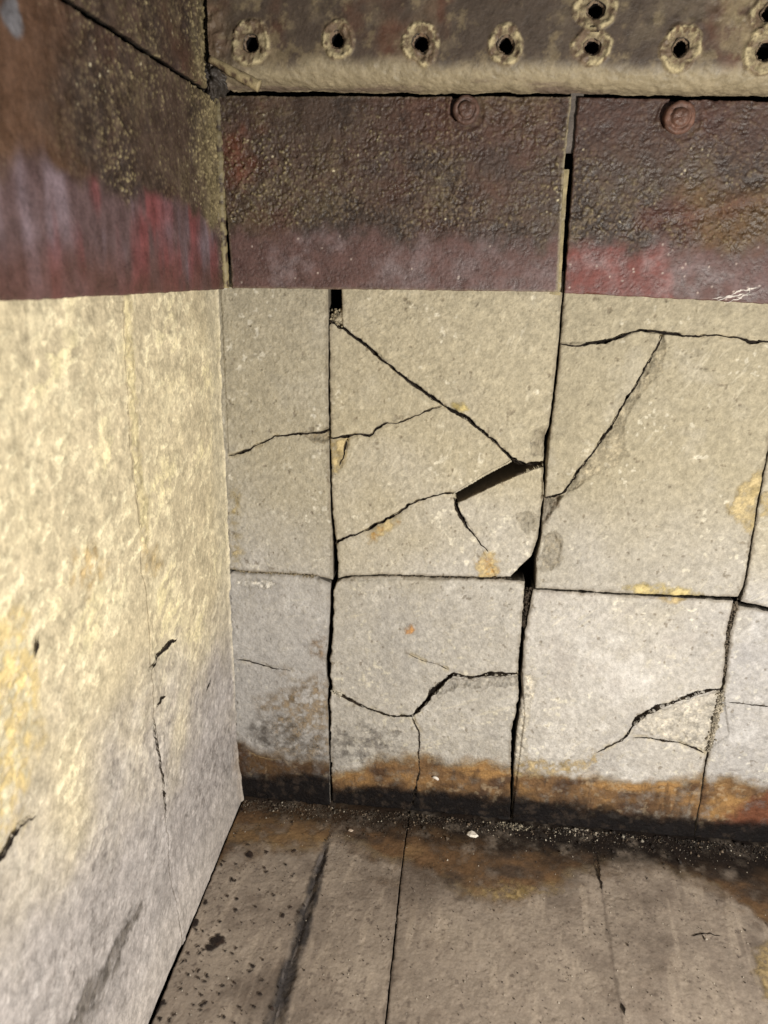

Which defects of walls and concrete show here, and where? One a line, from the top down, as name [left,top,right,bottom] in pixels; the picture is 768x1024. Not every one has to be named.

crack [230,321,543,552]
crack [544,329,768,498]
crack [154,696,167,811]
crack [152,639,177,669]
crack [330,653,518,805]
crack [597,688,768,753]